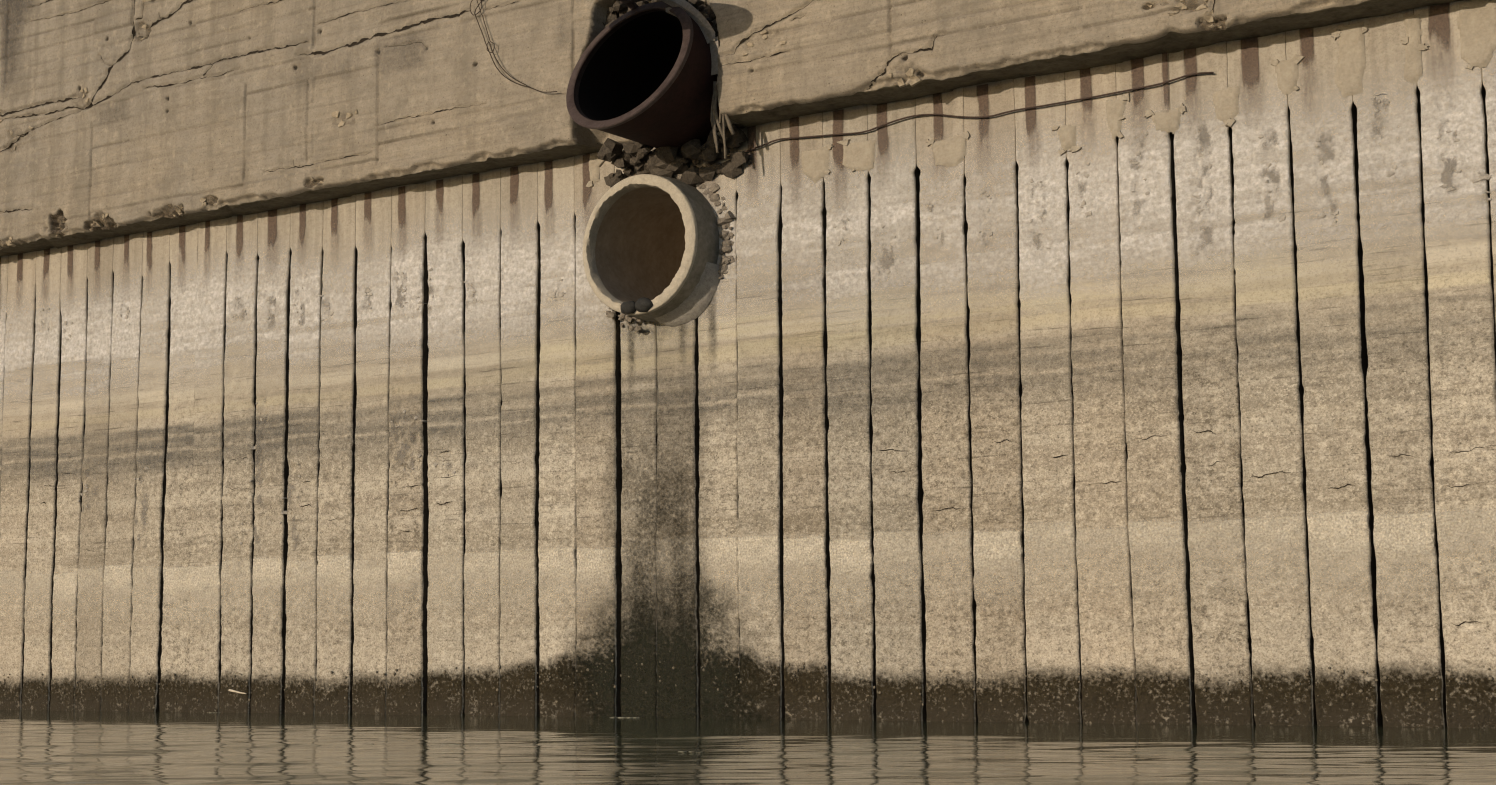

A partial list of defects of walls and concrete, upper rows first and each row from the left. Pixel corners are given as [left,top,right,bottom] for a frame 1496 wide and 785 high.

crack [0,0,518,152]
crack [720,3,810,66]
crack [867,35,940,90]
leakage [0,449,1496,719]